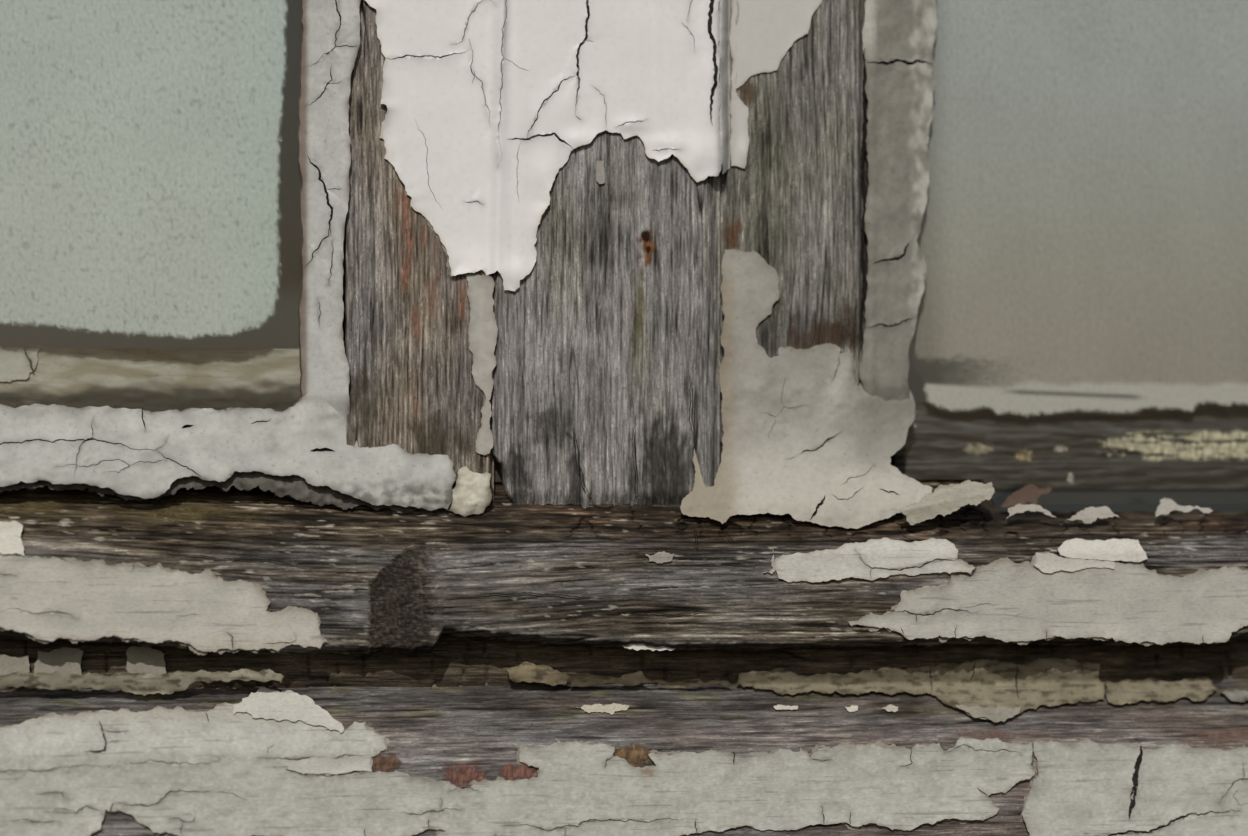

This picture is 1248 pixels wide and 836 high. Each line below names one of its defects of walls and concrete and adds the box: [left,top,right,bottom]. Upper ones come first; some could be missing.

crack [384,0,647,185]
crack [685,0,718,123]
crack [309,159,339,273]
peeling [364,0,822,455]
rust [638,230,655,265]
crack [835,49,931,375]
crack [0,407,198,475]
peeling [680,249,1248,646]
peeling [0,521,1248,836]
rust [442,761,539,788]
rust [614,743,652,775]
crack [1108,746,1248,836]